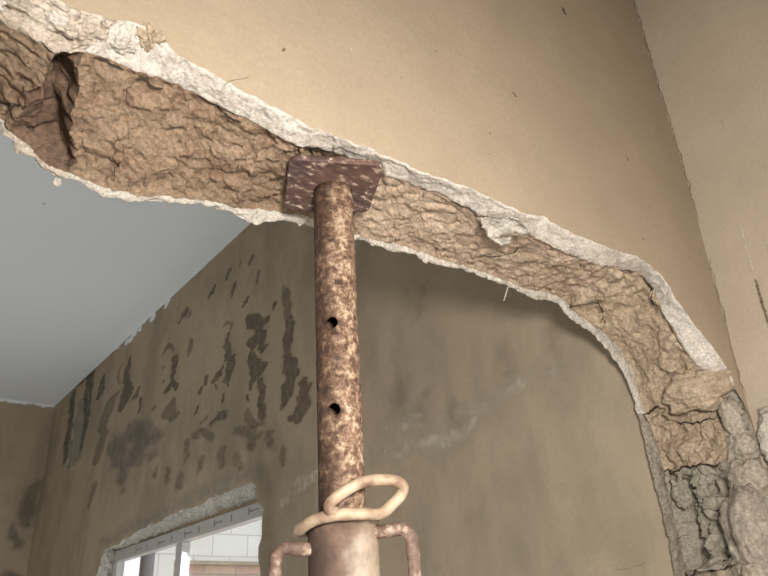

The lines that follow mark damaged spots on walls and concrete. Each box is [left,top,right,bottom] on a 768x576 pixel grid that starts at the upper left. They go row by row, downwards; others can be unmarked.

spalling [0,0,618,267]
crack [634,1,699,222]
spalling [353,173,742,576]
crack [643,406,716,425]
crack [710,260,746,395]
spalling [723,376,756,436]
spalling [97,481,256,576]